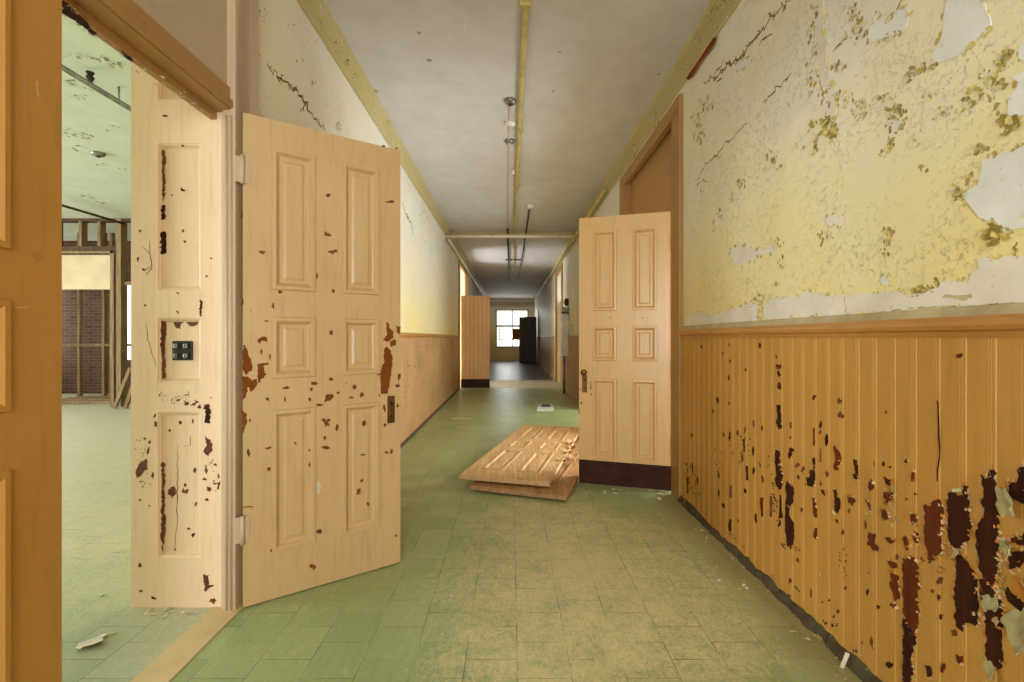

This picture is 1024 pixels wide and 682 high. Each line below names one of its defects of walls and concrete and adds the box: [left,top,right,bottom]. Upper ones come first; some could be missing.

crack [267,62,326,130]
peeling [680,0,727,80]
crack [703,0,790,84]
peeling [796,0,913,158]
peeling [905,0,993,84]
crack [697,123,747,183]
peeling [684,42,1024,326]
peeling [713,405,1024,682]